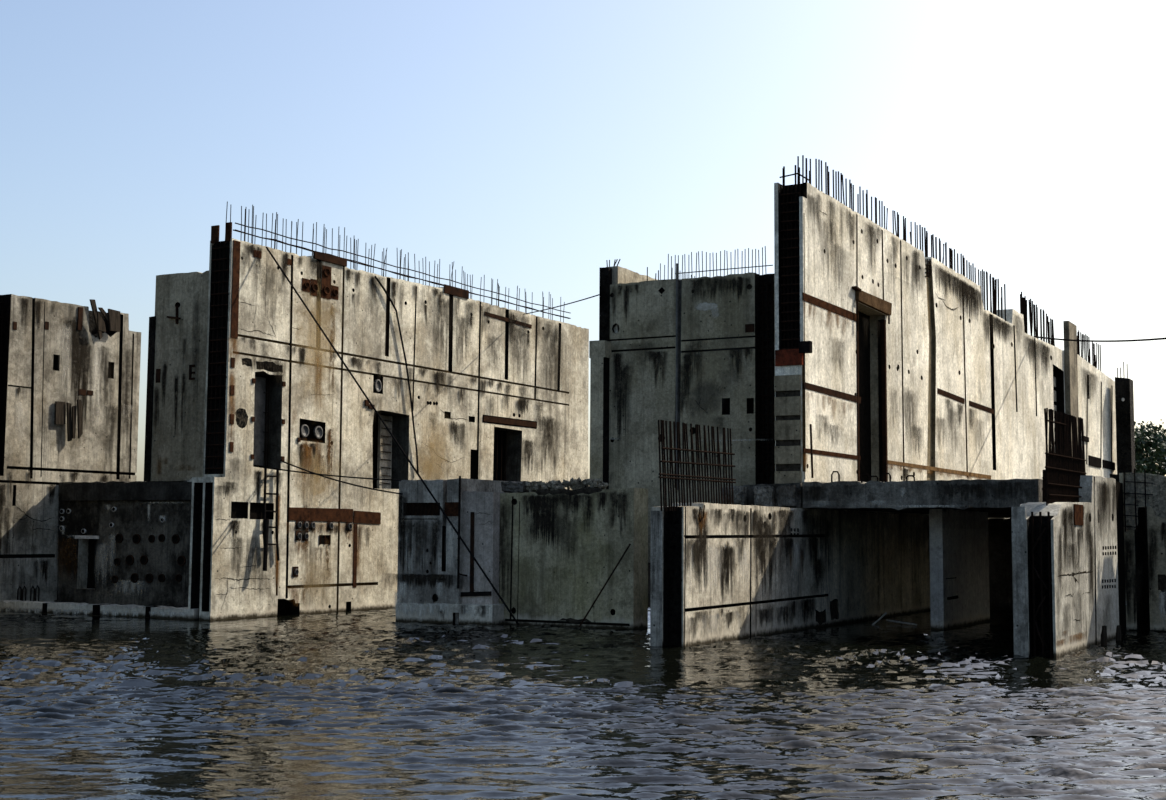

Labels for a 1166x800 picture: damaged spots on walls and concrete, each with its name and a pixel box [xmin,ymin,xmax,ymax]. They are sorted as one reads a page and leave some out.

leakage [22,298,41,323]
leakage [612,284,638,319]
leakage [692,277,749,311]
corrosion [315,308,335,399]
leakage [614,354,627,439]
leakage [648,352,666,383]
corrosion [304,429,333,483]
leakage [0,472,27,557]
leakage [499,505,509,595]
leakage [523,492,627,551]
leakage [687,487,831,625]
leakage [691,607,743,639]